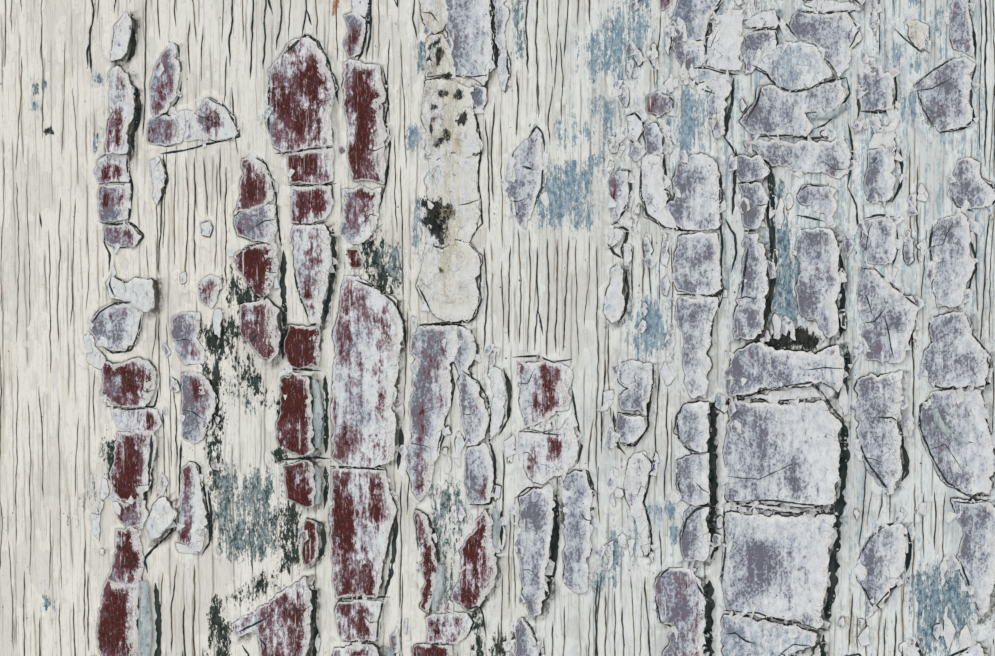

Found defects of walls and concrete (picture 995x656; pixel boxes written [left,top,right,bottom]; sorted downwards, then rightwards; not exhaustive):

crack [0,0,116,656]
peeling [84,10,240,656]
crack [152,316,178,494]
crack [160,564,204,656]
crack [142,0,338,277]
water stain [199,264,308,656]
crack [366,0,417,436]
crack [497,453,516,656]
peeling [227,0,995,656]
crack [631,238,673,324]
crack [654,372,672,501]
crack [848,469,946,656]